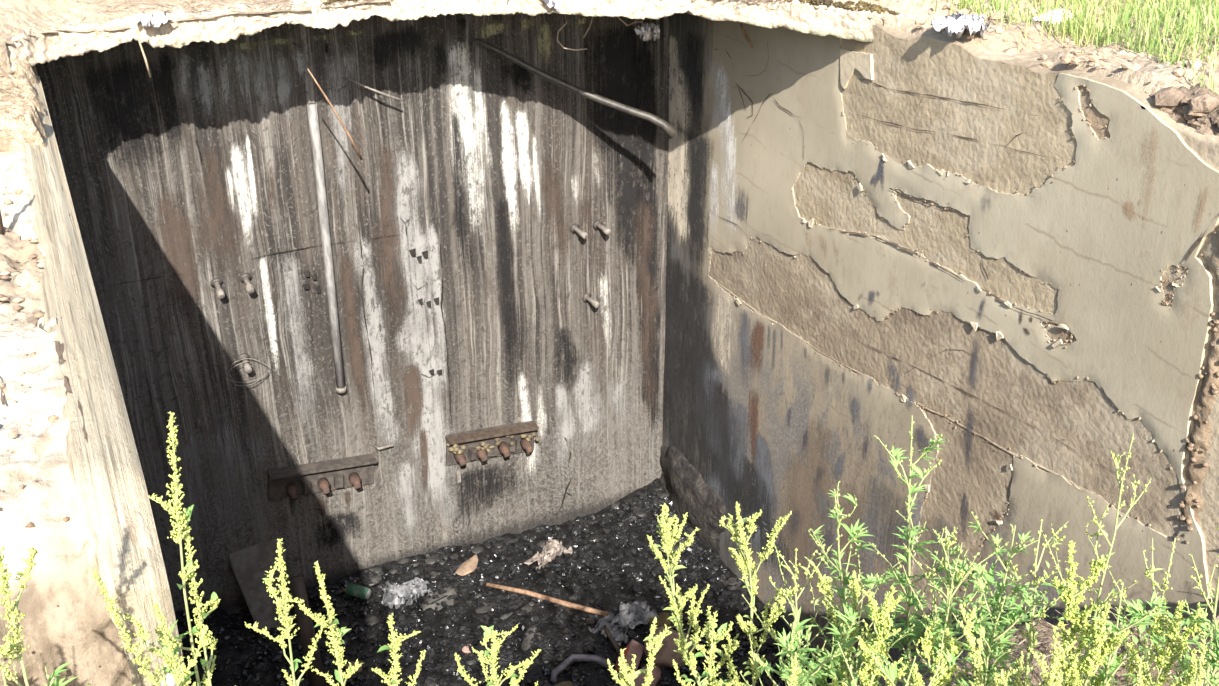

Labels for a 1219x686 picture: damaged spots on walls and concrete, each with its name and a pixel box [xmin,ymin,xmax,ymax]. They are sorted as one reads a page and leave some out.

damp [481,22,505,39]
spalling [307,69,363,160]
crack [715,43,804,159]
flaking render [838,24,1111,196]
damp [85,27,624,471]
flaking render [792,162,1077,349]
damp [354,151,515,535]
rust [750,320,764,374]
rust [749,392,759,458]
flaking render [709,227,1219,614]
damp [318,513,360,547]
damp [930,491,969,566]